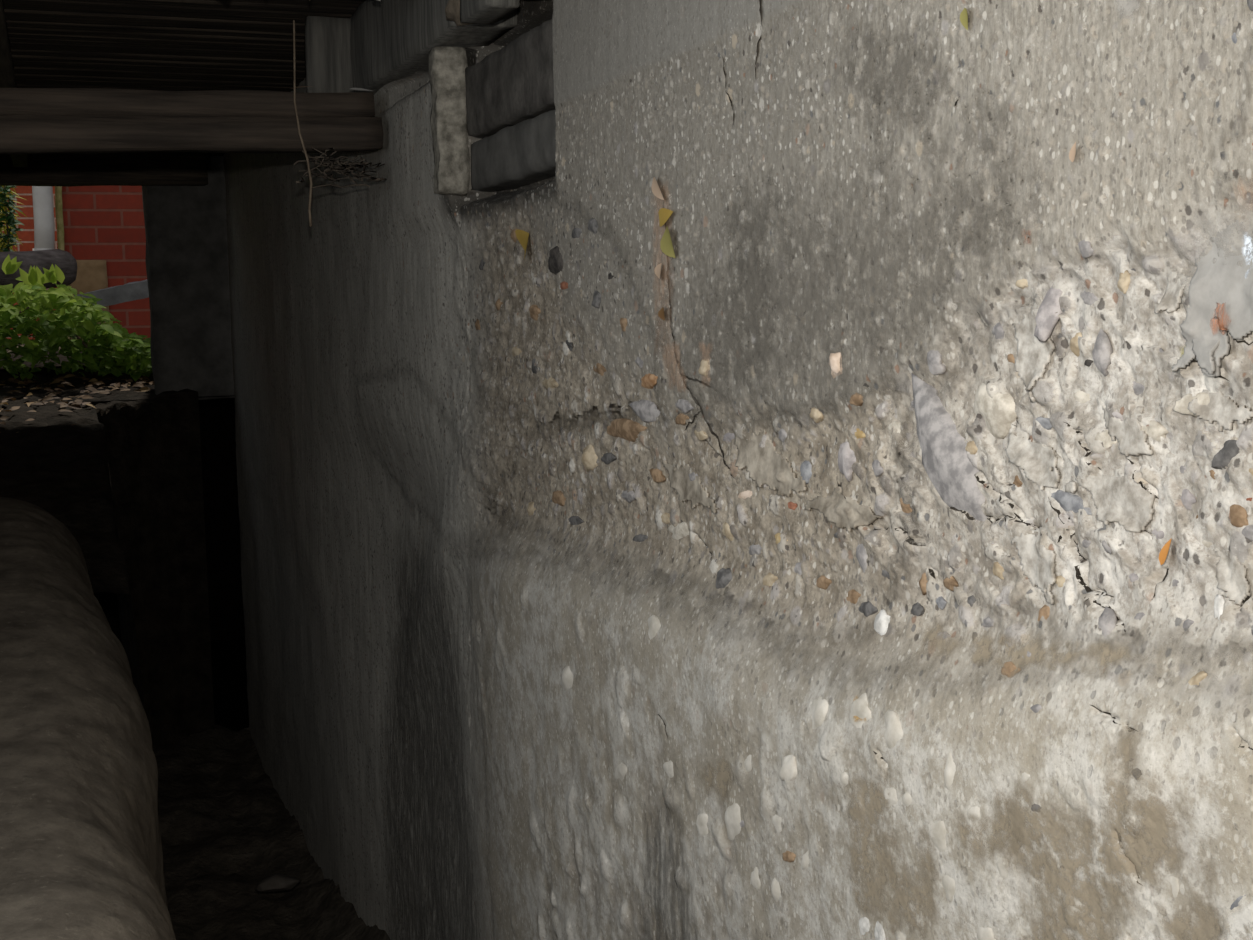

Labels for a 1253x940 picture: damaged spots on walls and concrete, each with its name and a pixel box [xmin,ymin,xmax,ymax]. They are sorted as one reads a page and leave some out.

crack [722,0,762,124]
water stain [848,35,934,106]
crack [662,186,737,482]
water stain [694,200,982,401]
spalling [450,187,1253,657]
water stain [847,776,934,935]
water stain [957,736,1180,940]
water stain [1143,900,1253,940]